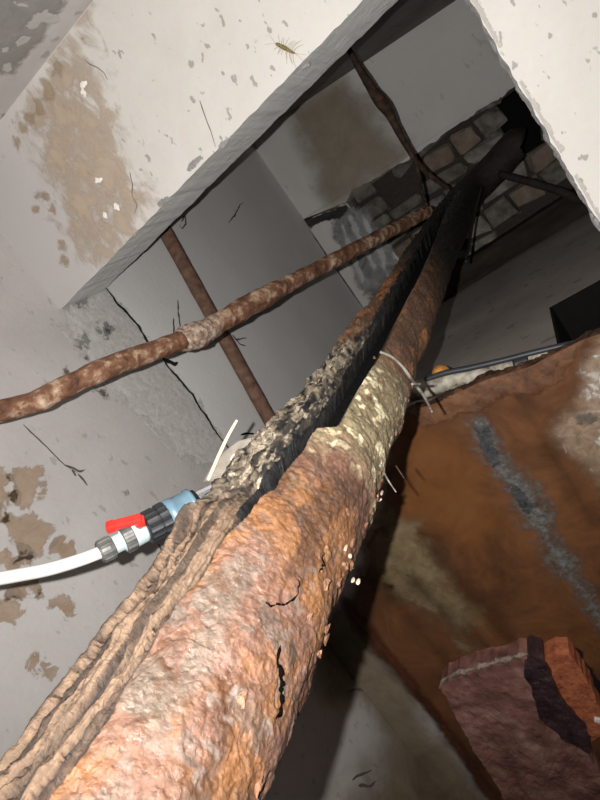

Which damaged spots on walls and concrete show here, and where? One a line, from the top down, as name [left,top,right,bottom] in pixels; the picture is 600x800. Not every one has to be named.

peeling [0,0,66,74]
damp [13,46,144,265]
crack [106,288,148,342]
rust [159,225,275,427]
damp [349,241,398,300]
crack [163,358,255,458]
peeling [0,579,75,625]
peeling [0,465,76,570]
crack [276,645,285,719]
rust [317,624,330,659]
rust [323,334,600,800]
damp [473,419,600,629]